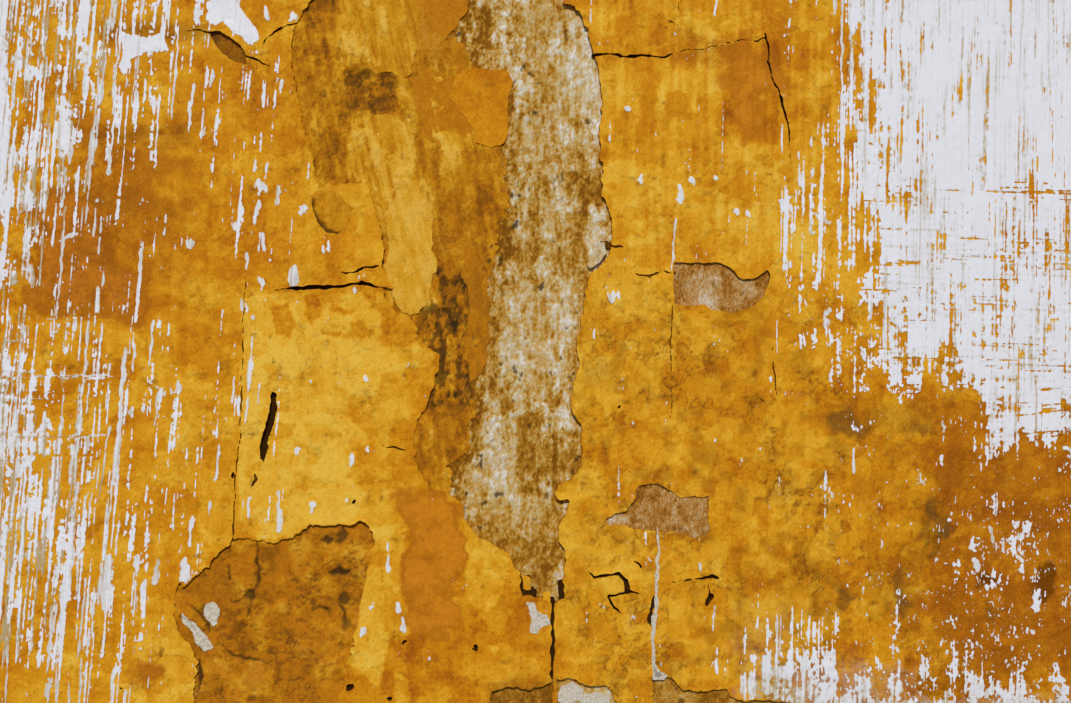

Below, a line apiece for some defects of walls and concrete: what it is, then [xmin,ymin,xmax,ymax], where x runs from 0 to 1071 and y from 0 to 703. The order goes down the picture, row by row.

crack [591,50,685,59]
crack [715,36,790,141]
peeling [0,0,375,703]
crack [275,265,380,291]
peeling [291,0,612,634]
peeling [673,262,769,313]
peeling [794,0,1071,579]
crack [232,285,277,541]
peeling [606,483,710,538]
crack [589,528,719,680]
peeling [652,603,1071,703]